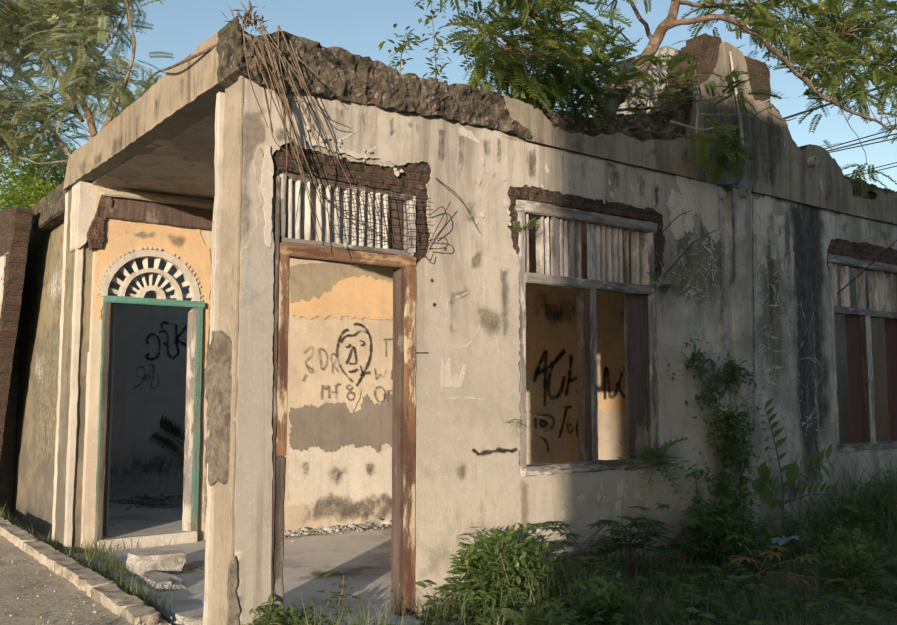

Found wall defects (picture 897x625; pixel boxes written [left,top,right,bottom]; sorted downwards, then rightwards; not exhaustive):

spalling [216,16,531,144]
flaking render [474,157,732,281]
flaking render [86,112,431,625]
water stain [785,204,828,482]
water stain [314,494,392,520]